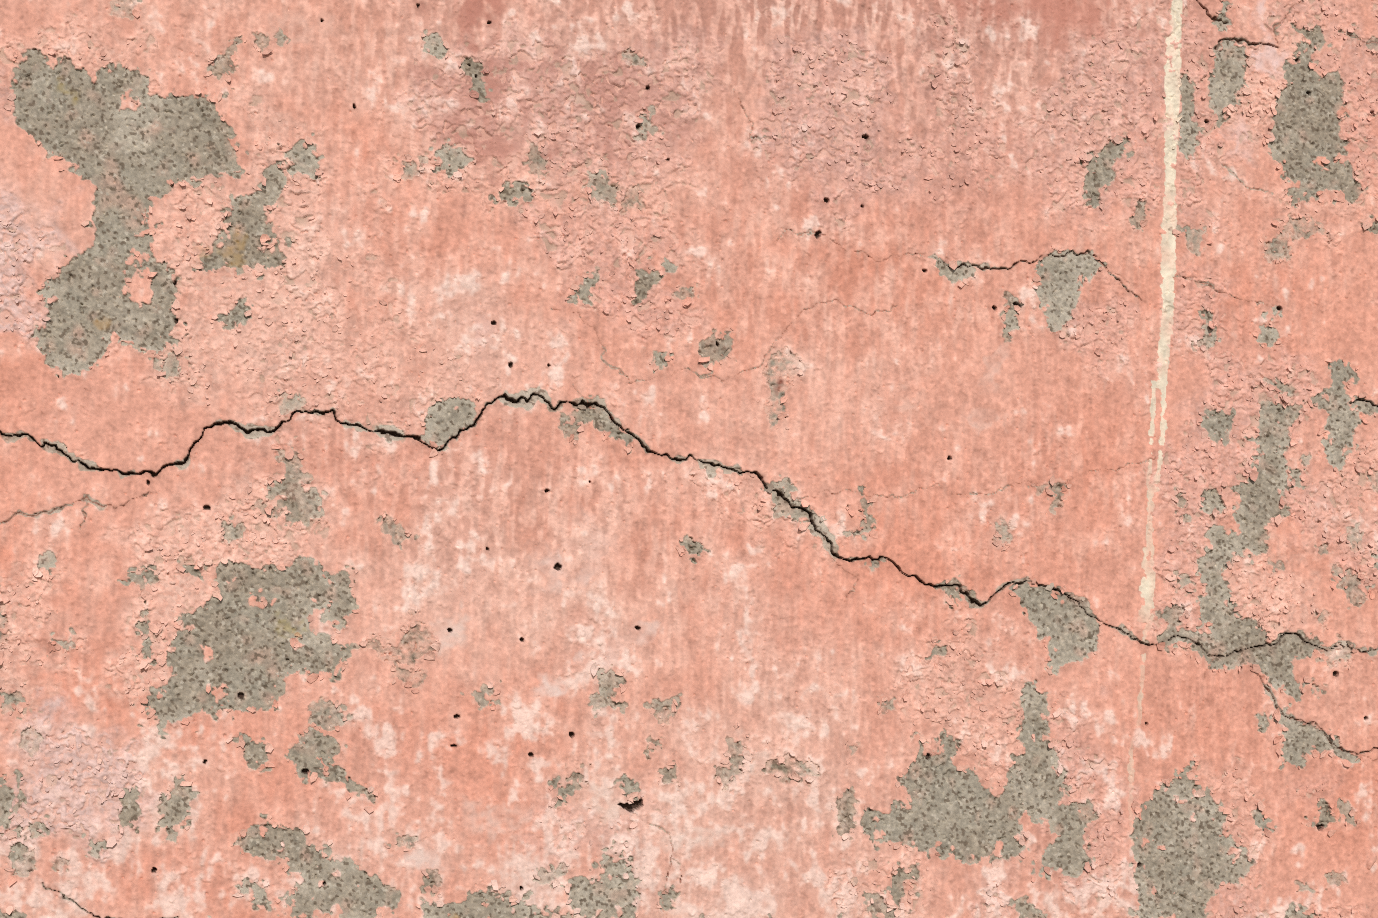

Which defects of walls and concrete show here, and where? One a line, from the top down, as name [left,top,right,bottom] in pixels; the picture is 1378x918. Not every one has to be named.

peeling [0,0,501,457]
crack [777,230,1142,301]
peeling [1000,245,1140,370]
peeling [1029,0,1378,266]
peeling [0,551,201,887]
peeling [108,437,442,814]
peeling [230,814,681,918]
peeling [614,774,644,804]
peeling [588,662,683,786]
crack [0,300,1378,762]
peeling [829,575,1278,918]
peeling [1152,273,1378,771]